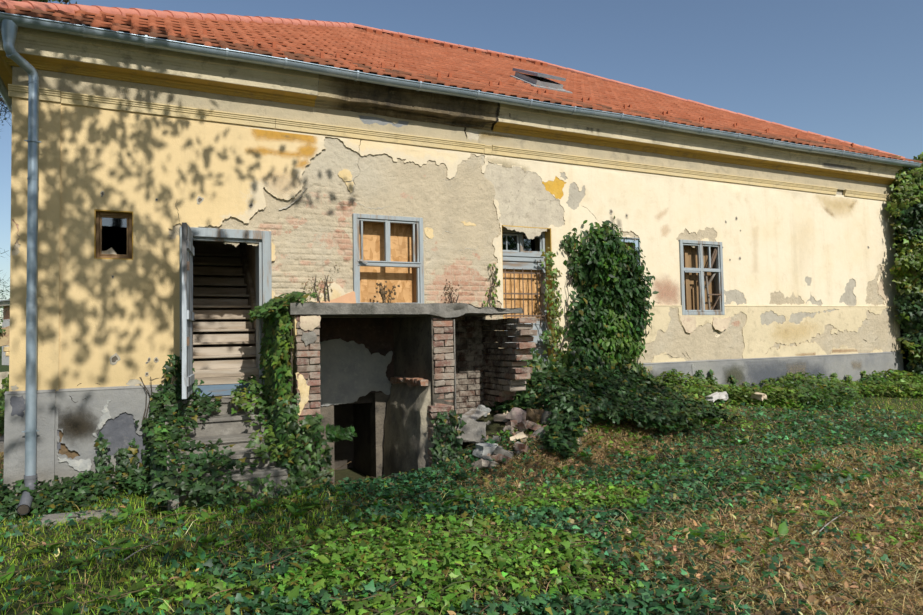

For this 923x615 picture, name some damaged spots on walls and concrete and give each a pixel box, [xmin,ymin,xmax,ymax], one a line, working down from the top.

peeling [466,130,479,141]
crack [464,105,510,139]
flaking render [168,223,182,239]
flaking render [199,137,585,331]
flaking render [676,227,717,248]
flaking render [760,264,899,354]
flaking render [57,430,80,459]
damp [60,412,95,438]
flaking render [97,412,150,466]